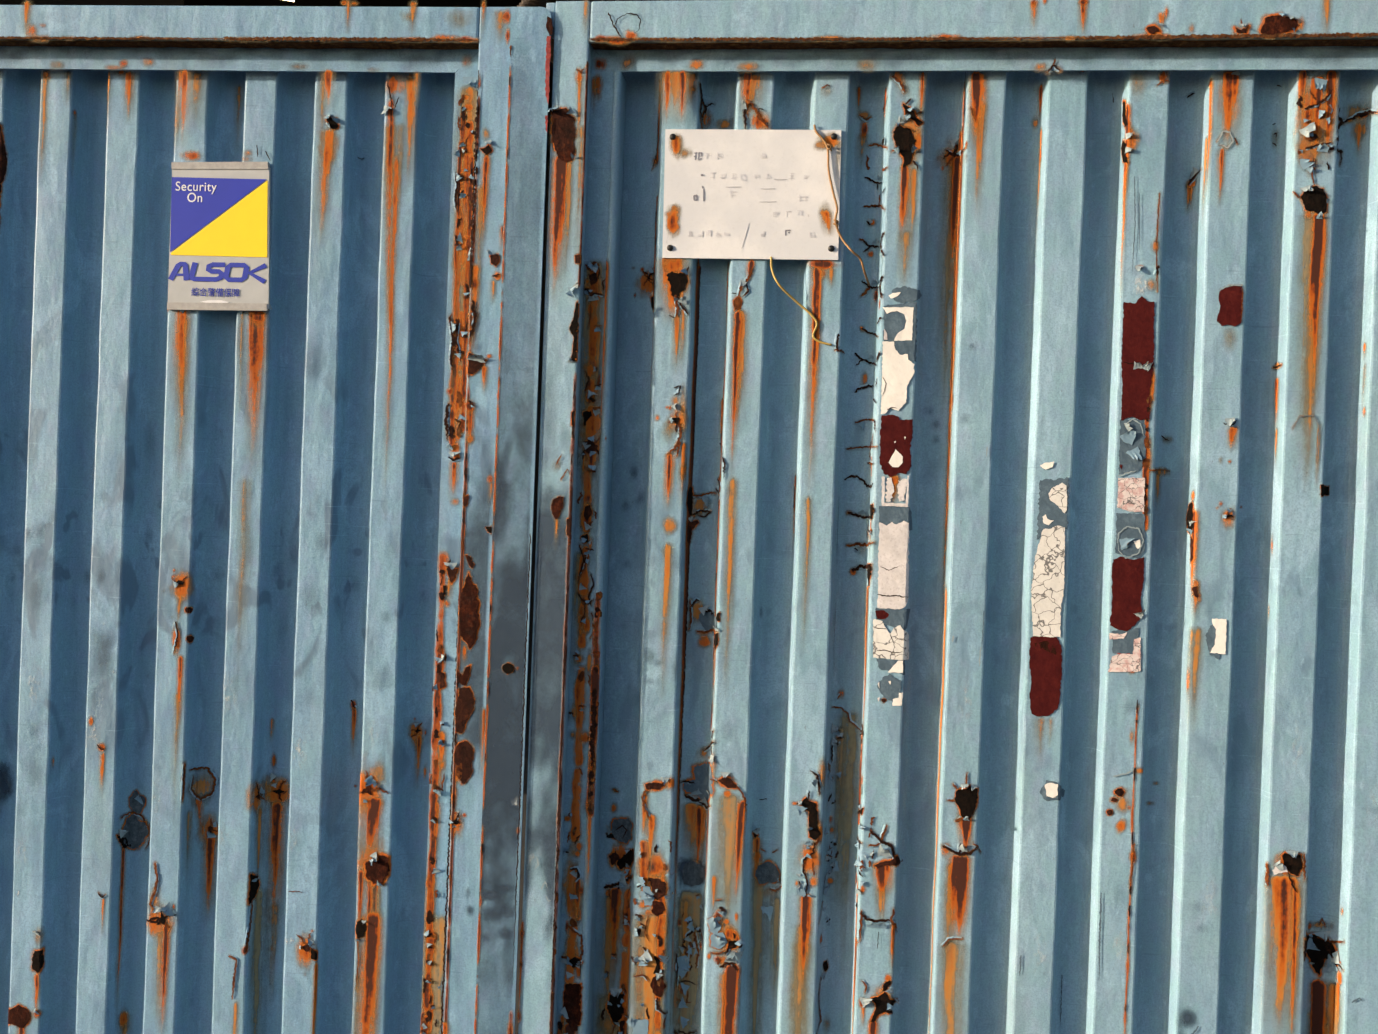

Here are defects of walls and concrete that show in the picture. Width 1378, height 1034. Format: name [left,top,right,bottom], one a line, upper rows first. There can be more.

rust [0,0,481,1034]
rust [549,376,603,1034]
rust [595,848,702,1034]
rust [653,196,701,862]
rust [809,260,834,446]
rust [791,586,898,1034]
rust [928,589,979,1034]
rust [550,0,1378,287]
rust [943,71,986,568]
peeling [1115,513,1145,559]
peeling [1118,419,1146,477]
peeling [1133,361,1152,371]